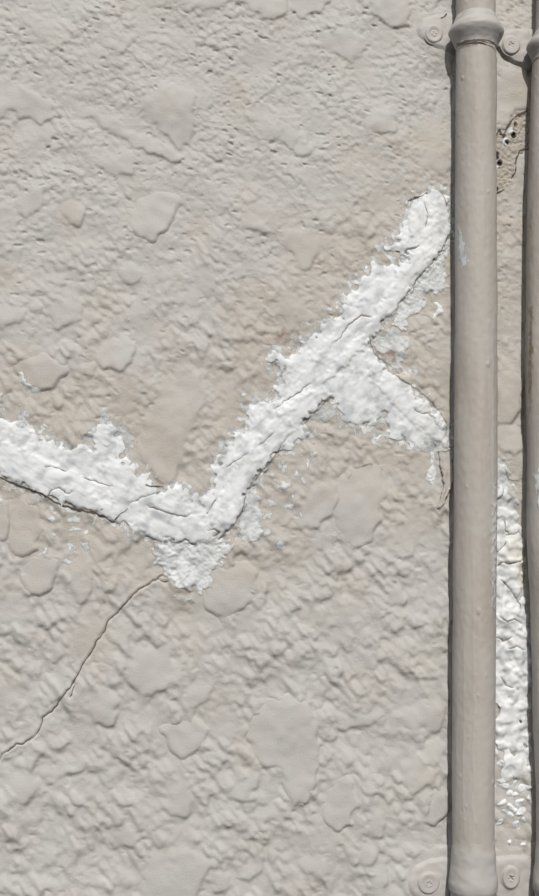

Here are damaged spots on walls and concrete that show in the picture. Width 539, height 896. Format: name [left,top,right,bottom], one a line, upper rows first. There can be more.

peeling [496,109,530,194]
crack [407,192,447,227]
crack [402,231,451,301]
crack [335,315,447,424]
crack [0,397,331,546]
crack [0,575,168,758]